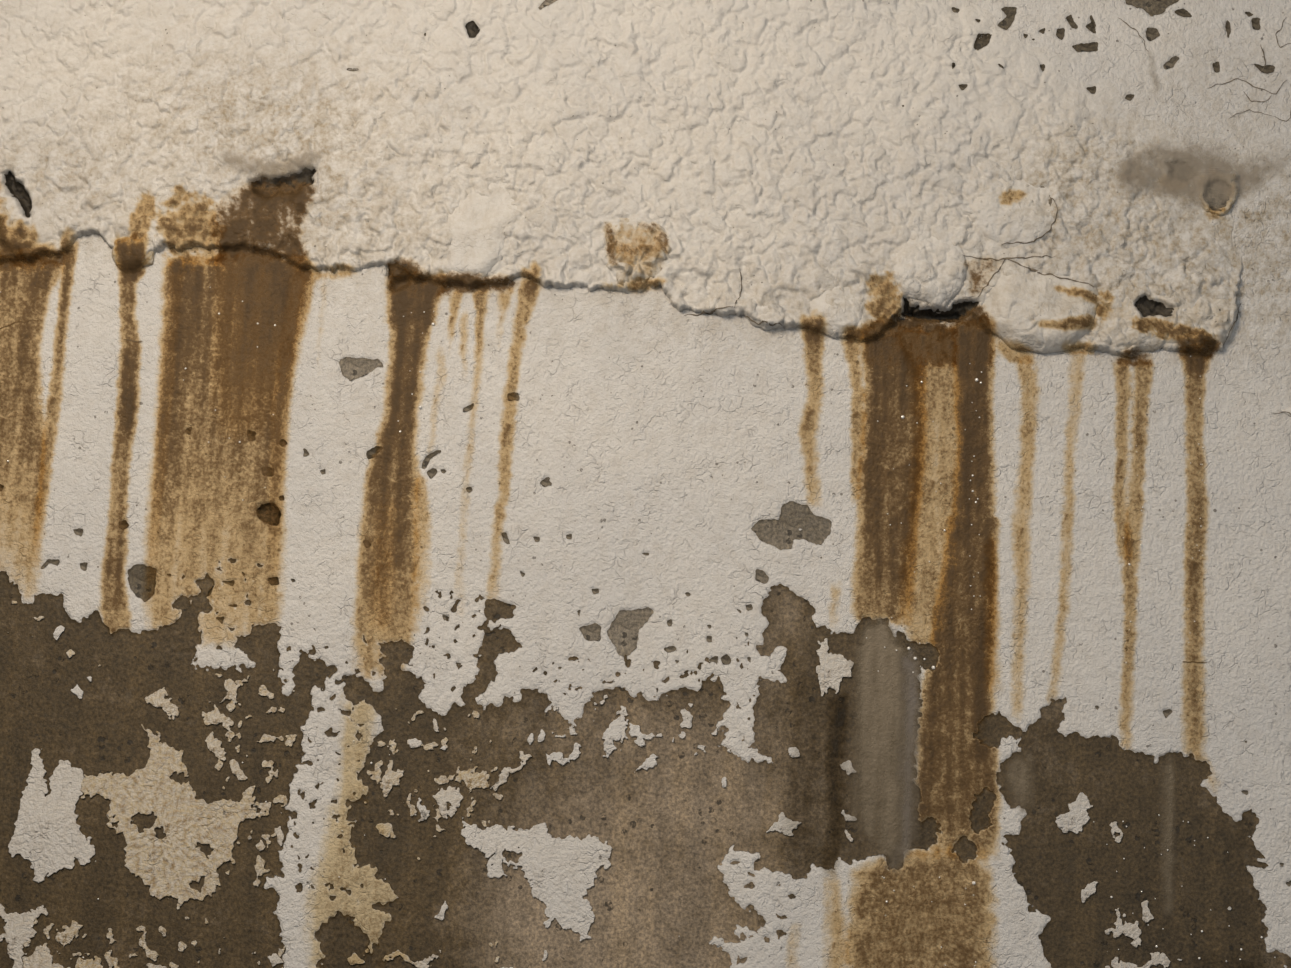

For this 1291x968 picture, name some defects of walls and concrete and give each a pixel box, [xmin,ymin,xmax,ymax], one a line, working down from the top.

spalling [974,7,1098,52]
peeling [1125,0,1192,41]
crack [1210,18,1291,122]
corrosion [0,216,76,530]
corrosion [103,175,315,632]
corrosion [357,260,538,643]
peeling [0,558,941,968]
peeling [751,501,831,558]
damp [833,619,919,856]
corrosion [845,260,997,968]
crack [964,196,1094,297]
peeling [951,697,1291,968]